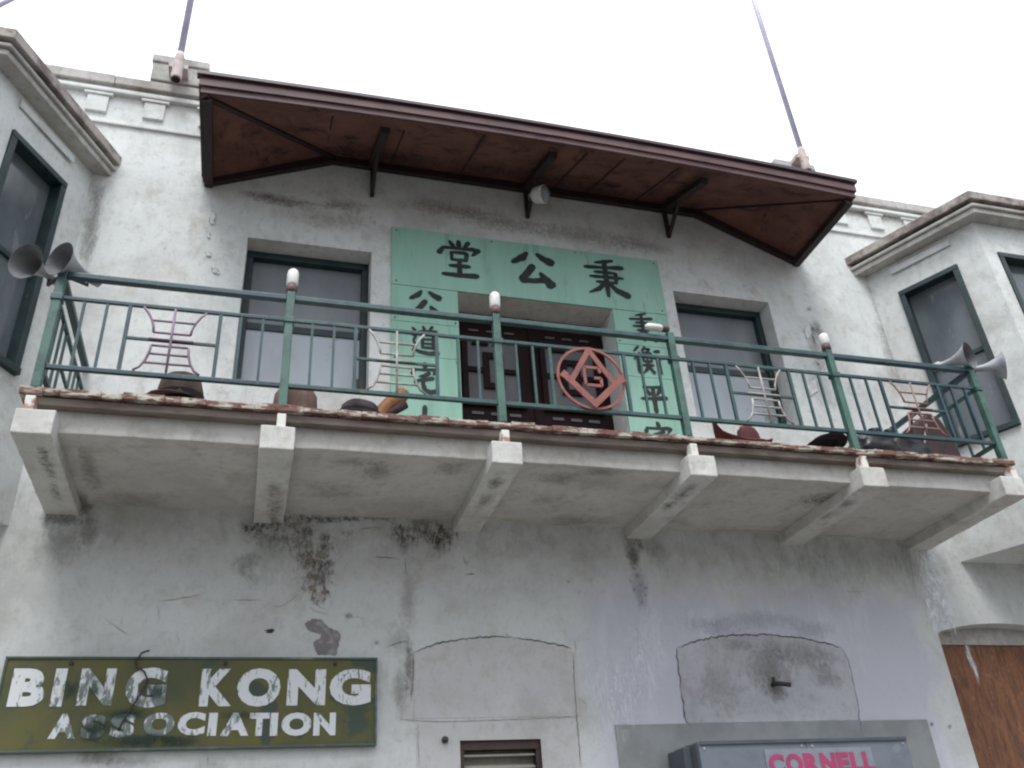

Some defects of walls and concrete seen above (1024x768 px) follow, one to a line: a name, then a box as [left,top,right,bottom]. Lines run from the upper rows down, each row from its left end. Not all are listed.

peeling [305,618,341,655]